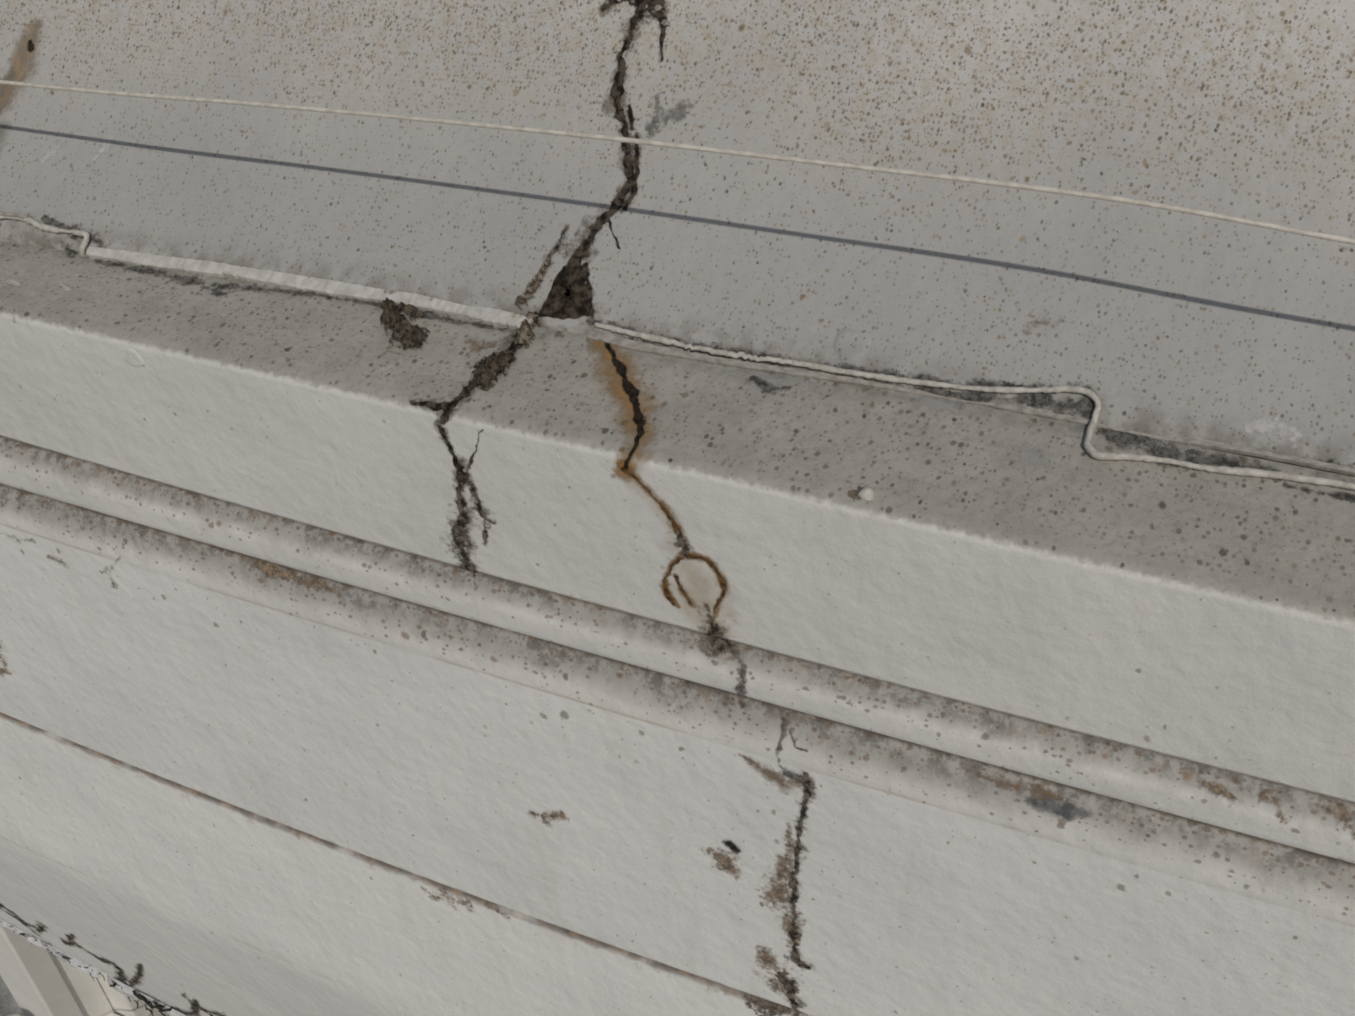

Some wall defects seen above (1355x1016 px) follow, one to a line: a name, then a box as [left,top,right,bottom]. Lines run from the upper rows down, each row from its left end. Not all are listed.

crack [410,0,747,708]
corrosion [590,340,728,623]
peeling [0,919,187,1016]
crack [776,709,815,1016]